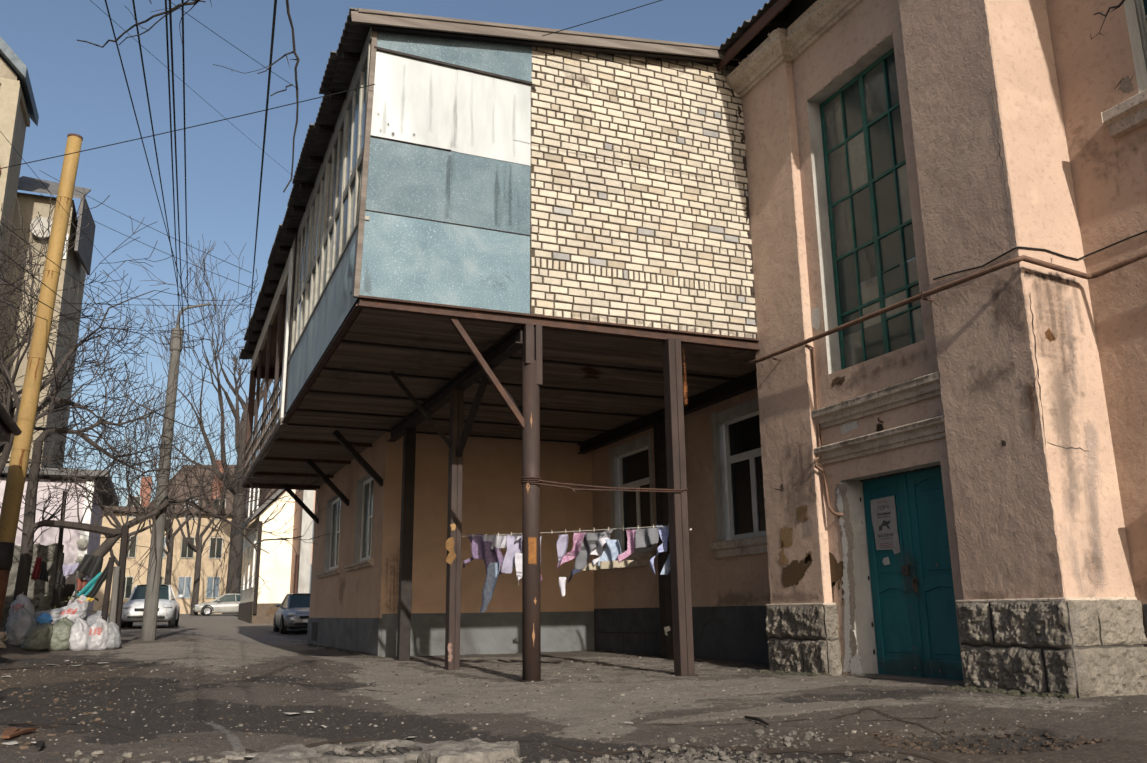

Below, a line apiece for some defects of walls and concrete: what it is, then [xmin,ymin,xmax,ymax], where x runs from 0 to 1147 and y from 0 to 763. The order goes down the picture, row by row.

crack [991,90,1014,245]
crack [1029,295,1091,452]
corrosion [528,537,536,565]
peeling [778,540,812,587]
peeling [829,484,875,674]
damp [1086,426,1103,585]